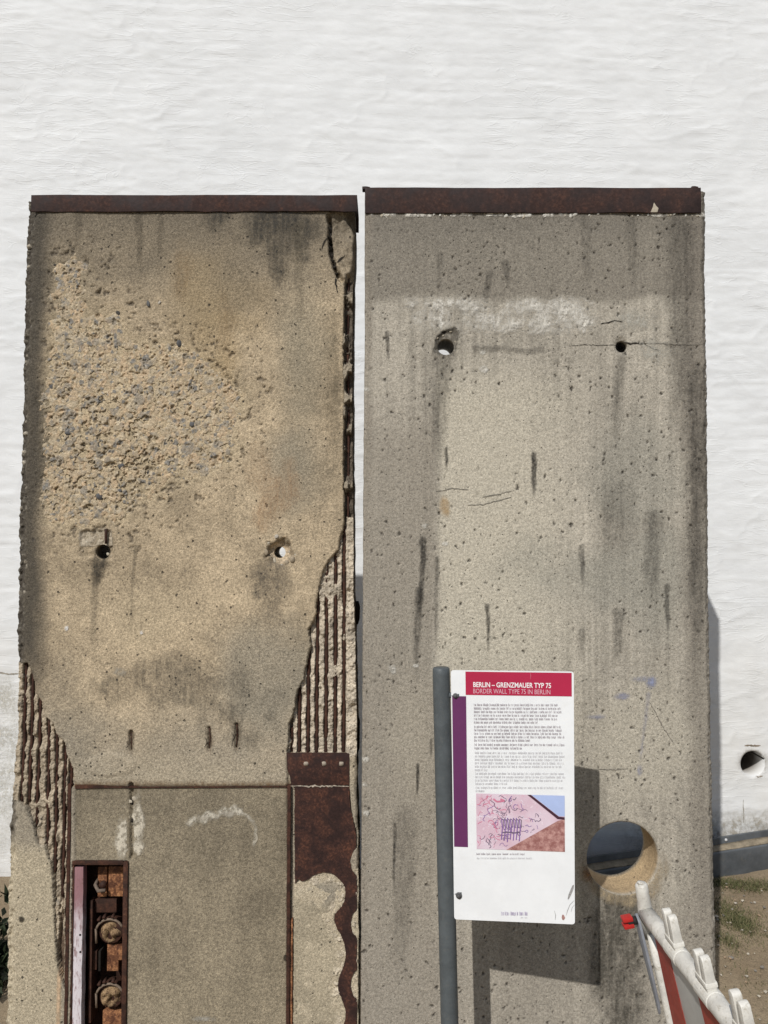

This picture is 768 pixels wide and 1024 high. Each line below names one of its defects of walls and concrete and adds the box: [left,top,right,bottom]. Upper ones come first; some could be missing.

crack [322,223,345,293]
crack [572,320,704,350]
spalling [288,278,357,757]
leakage [417,524,438,604]
spalling [0,662,76,979]